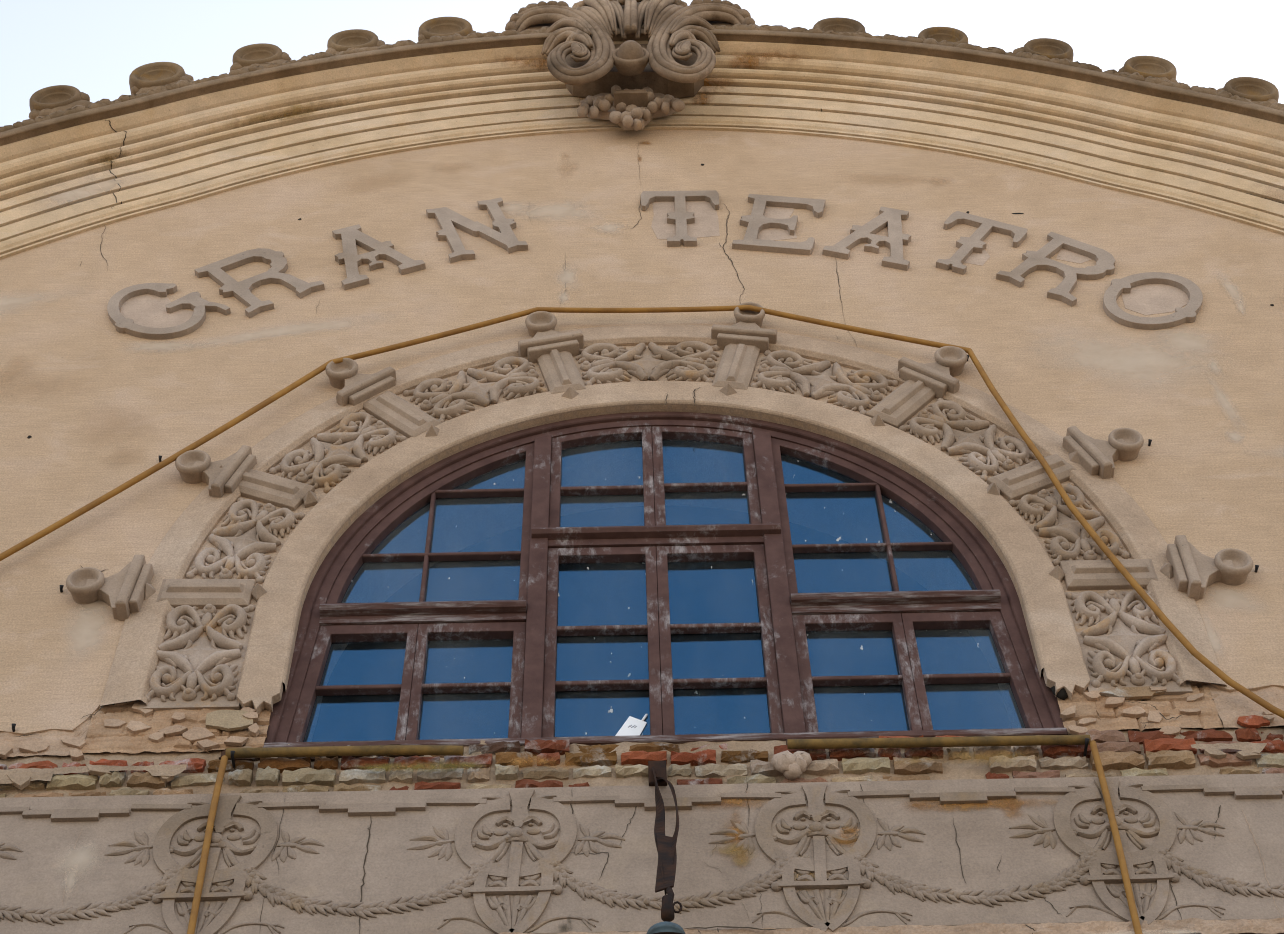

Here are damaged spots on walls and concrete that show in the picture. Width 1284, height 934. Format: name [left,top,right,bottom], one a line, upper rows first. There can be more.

crack [80,120,127,270]
crack [720,204,745,296]
spalling [0,702,271,790]
spalling [1055,681,1284,736]
crack [359,816,372,934]
crack [953,818,966,883]